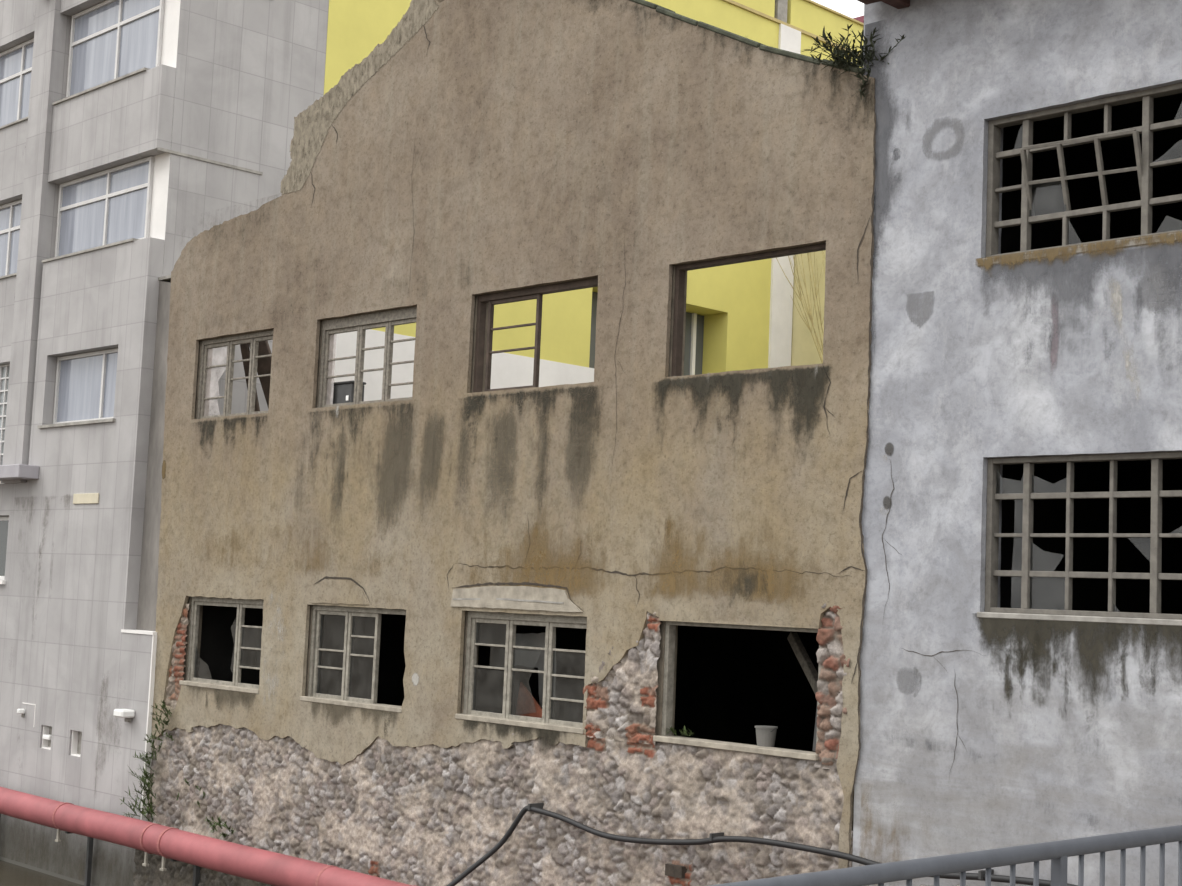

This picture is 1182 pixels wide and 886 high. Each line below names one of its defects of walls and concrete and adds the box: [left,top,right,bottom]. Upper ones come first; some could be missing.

leakage [198,416,267,445]
leakage [330,406,370,506]
leakage [378,403,444,520]
leakage [459,386,600,496]
crack [567,85,902,865]
leakage [655,366,829,438]
crack [447,515,533,581]
leakage [975,613,1182,701]
flaking render [133,603,853,886]
crack [902,648,984,777]